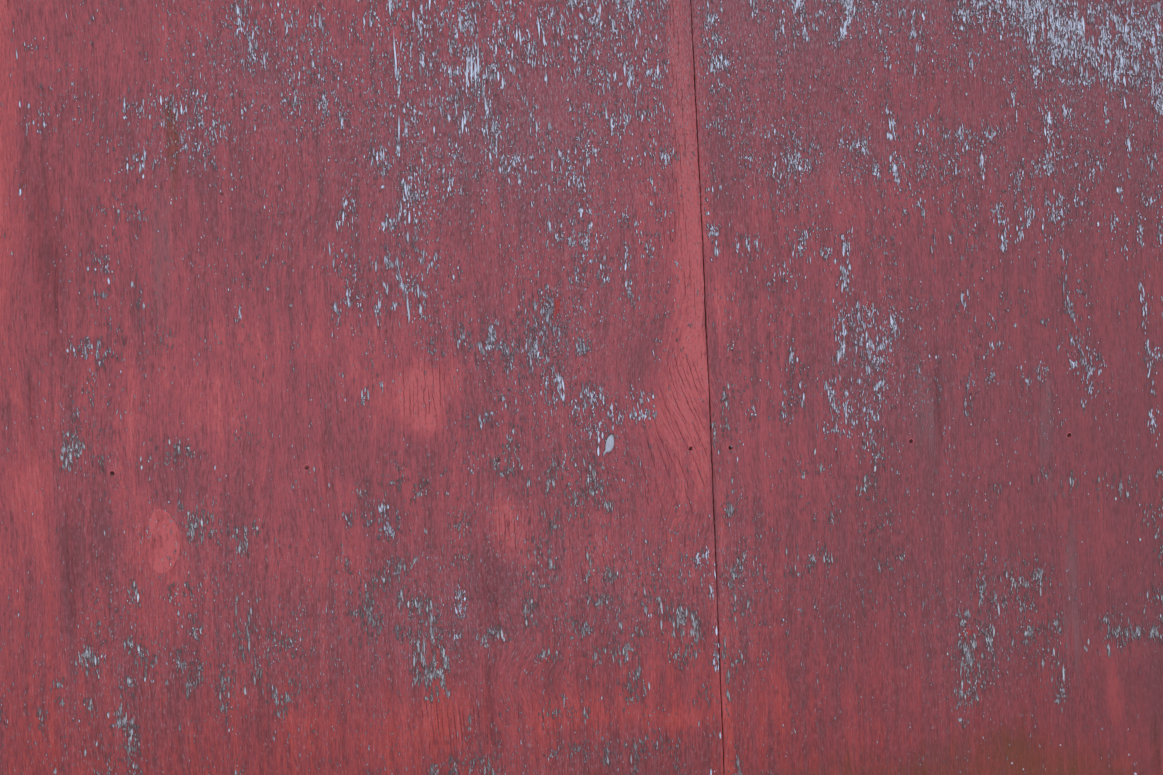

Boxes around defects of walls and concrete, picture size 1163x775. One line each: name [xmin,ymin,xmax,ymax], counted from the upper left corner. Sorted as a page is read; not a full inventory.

peeling [15,74,87,134]
peeling [106,82,271,183]
peeling [53,192,149,474]
peeling [227,0,1163,728]
peeling [136,436,205,472]
peeling [179,499,263,558]
peeling [37,574,320,775]
peeling [429,752,505,775]
peeling [544,731,683,775]